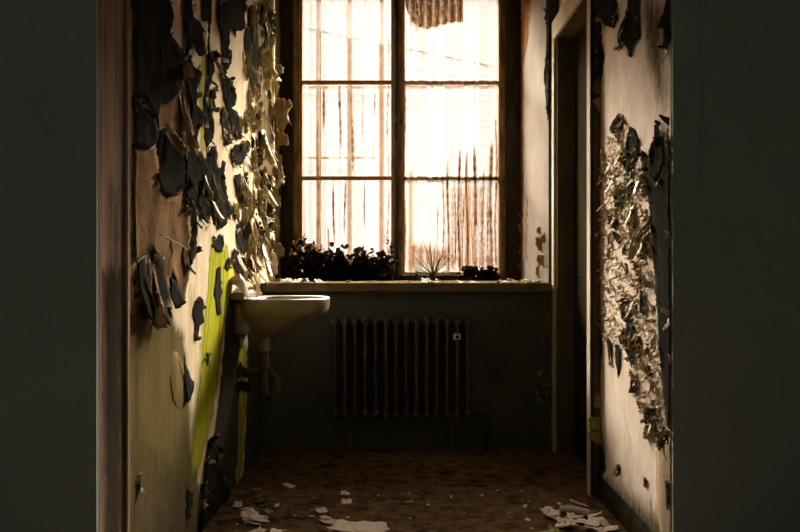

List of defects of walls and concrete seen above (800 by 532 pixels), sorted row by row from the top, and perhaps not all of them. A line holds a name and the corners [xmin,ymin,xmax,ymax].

peeling [593,0,641,112]
peeling [656,0,671,63]
peeling [131,0,293,341]
peeling [495,227,546,283]
peeling [594,113,671,450]
peeling [199,435,230,532]
peeling [586,393,620,477]